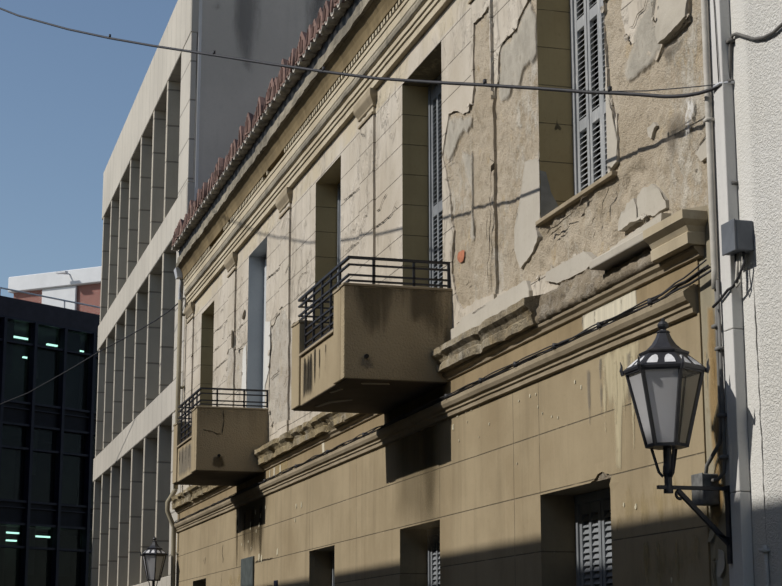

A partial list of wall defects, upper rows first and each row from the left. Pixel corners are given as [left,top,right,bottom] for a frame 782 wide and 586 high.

spalling [443,0,709,308]
spalling [535,248,659,324]
water stain [303,345,326,393]
water stain [600,339,638,466]
crack [753,278,767,542]
water stain [236,497,264,554]